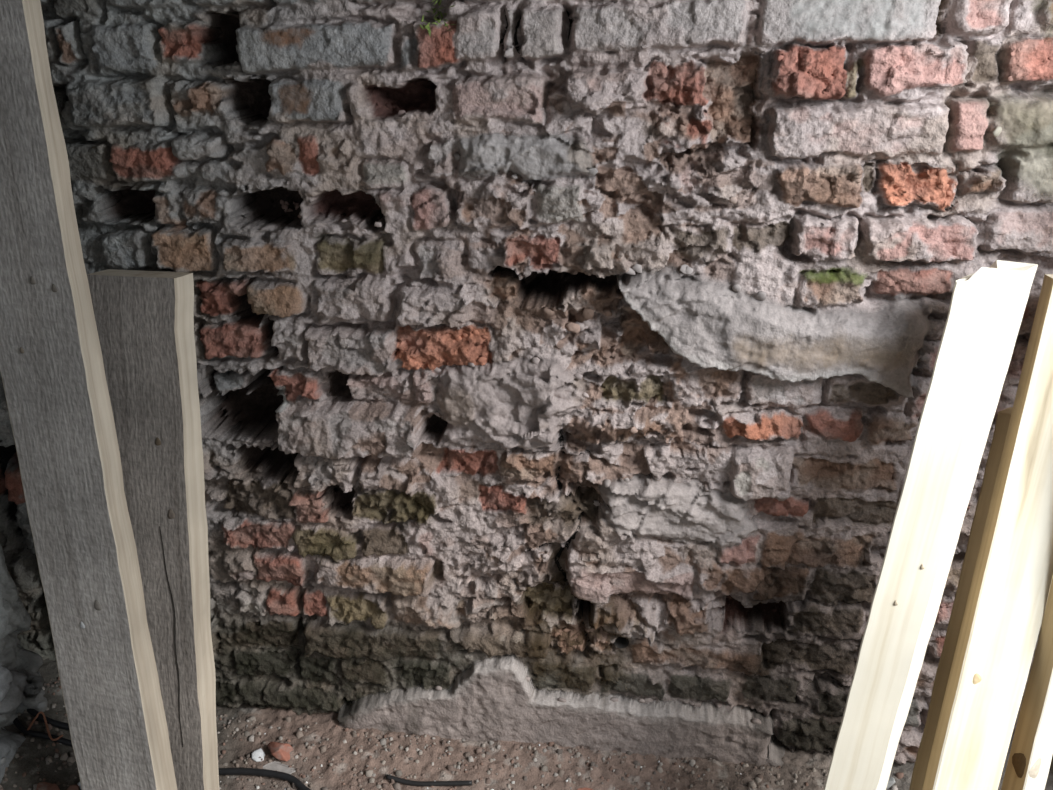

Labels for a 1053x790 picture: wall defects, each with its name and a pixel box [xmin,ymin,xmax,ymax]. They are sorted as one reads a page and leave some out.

spalling [198,12,274,121]
spalling [229,187,386,236]
spalling [363,79,438,121]
spalling [652,61,759,208]
spalling [768,44,859,100]
spalling [776,162,959,210]
flaking render [491,264,936,399]
spalling [201,365,360,524]
spalling [446,374,687,534]
spalling [454,540,618,657]
flaking render [337,655,785,767]
water stain [756,572,857,750]